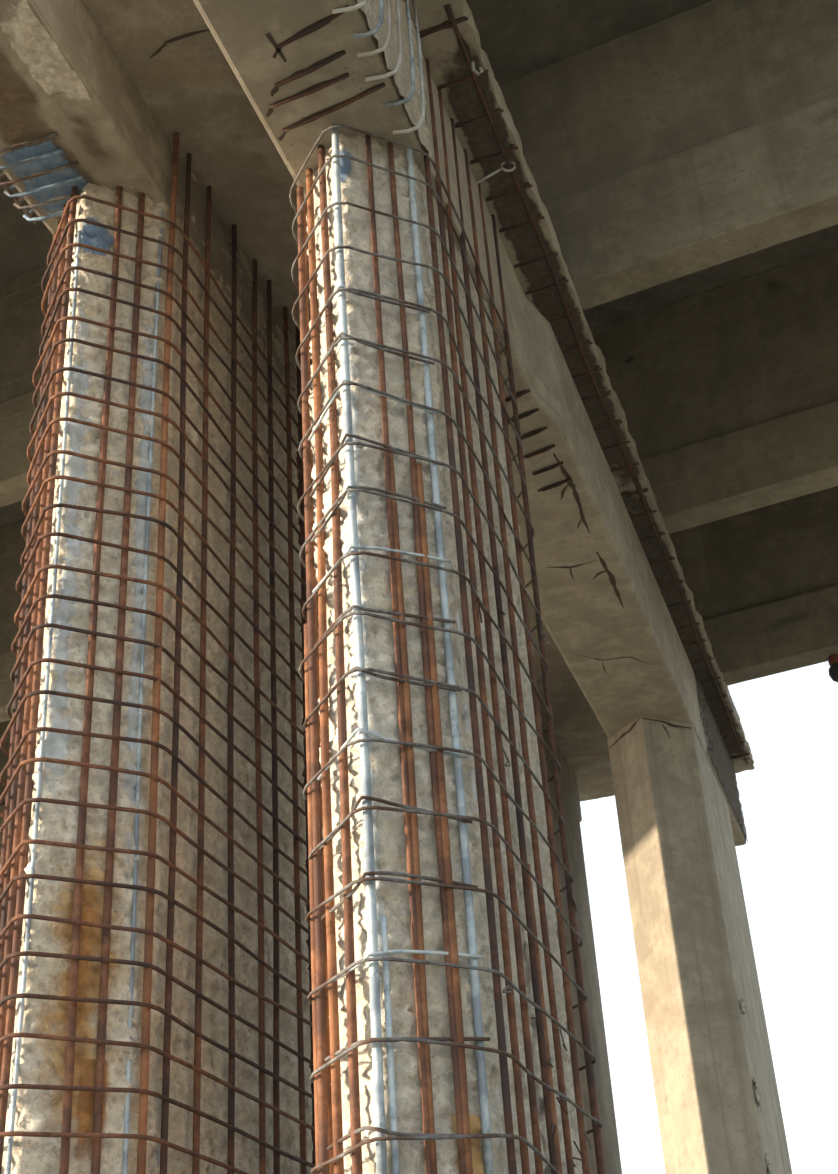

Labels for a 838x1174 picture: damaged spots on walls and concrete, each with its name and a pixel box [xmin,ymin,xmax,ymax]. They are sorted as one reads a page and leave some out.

spalling [265,0,750,843]
crack [547,453,624,608]
crack [580,655,648,674]
crack [609,718,691,748]
corrosion [44,868,114,1151]